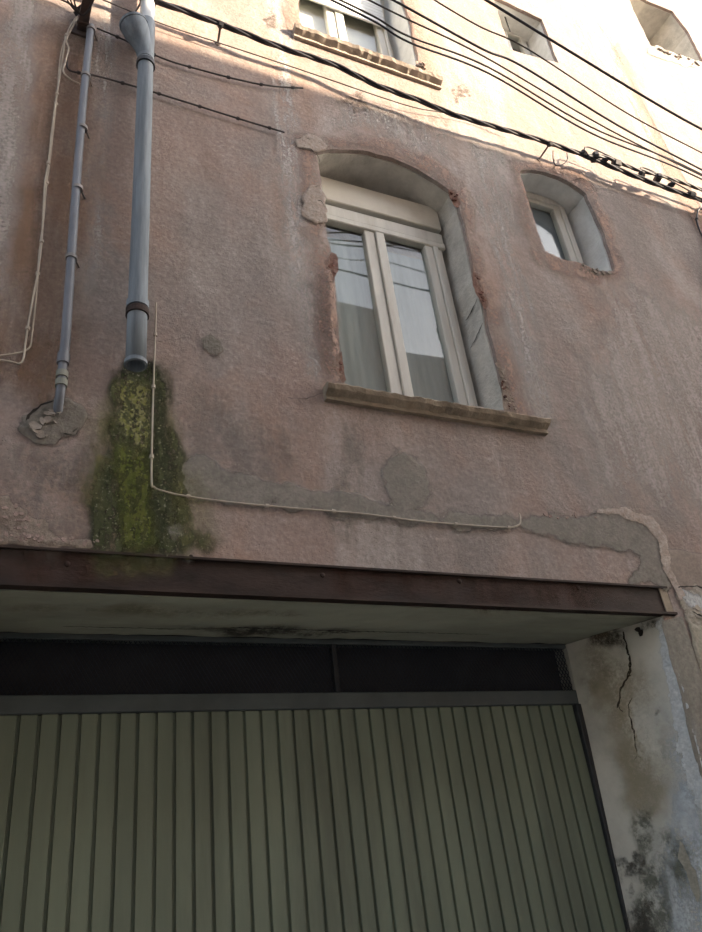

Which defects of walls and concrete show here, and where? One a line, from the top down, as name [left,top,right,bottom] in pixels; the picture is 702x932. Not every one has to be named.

flaking render [0,495,99,550]
flaking render [18,397,88,445]
leakage [99,379,188,550]
peeling [675,583,702,627]
crack [617,632,639,760]
peeling [655,617,702,813]
leakage [615,783,702,932]